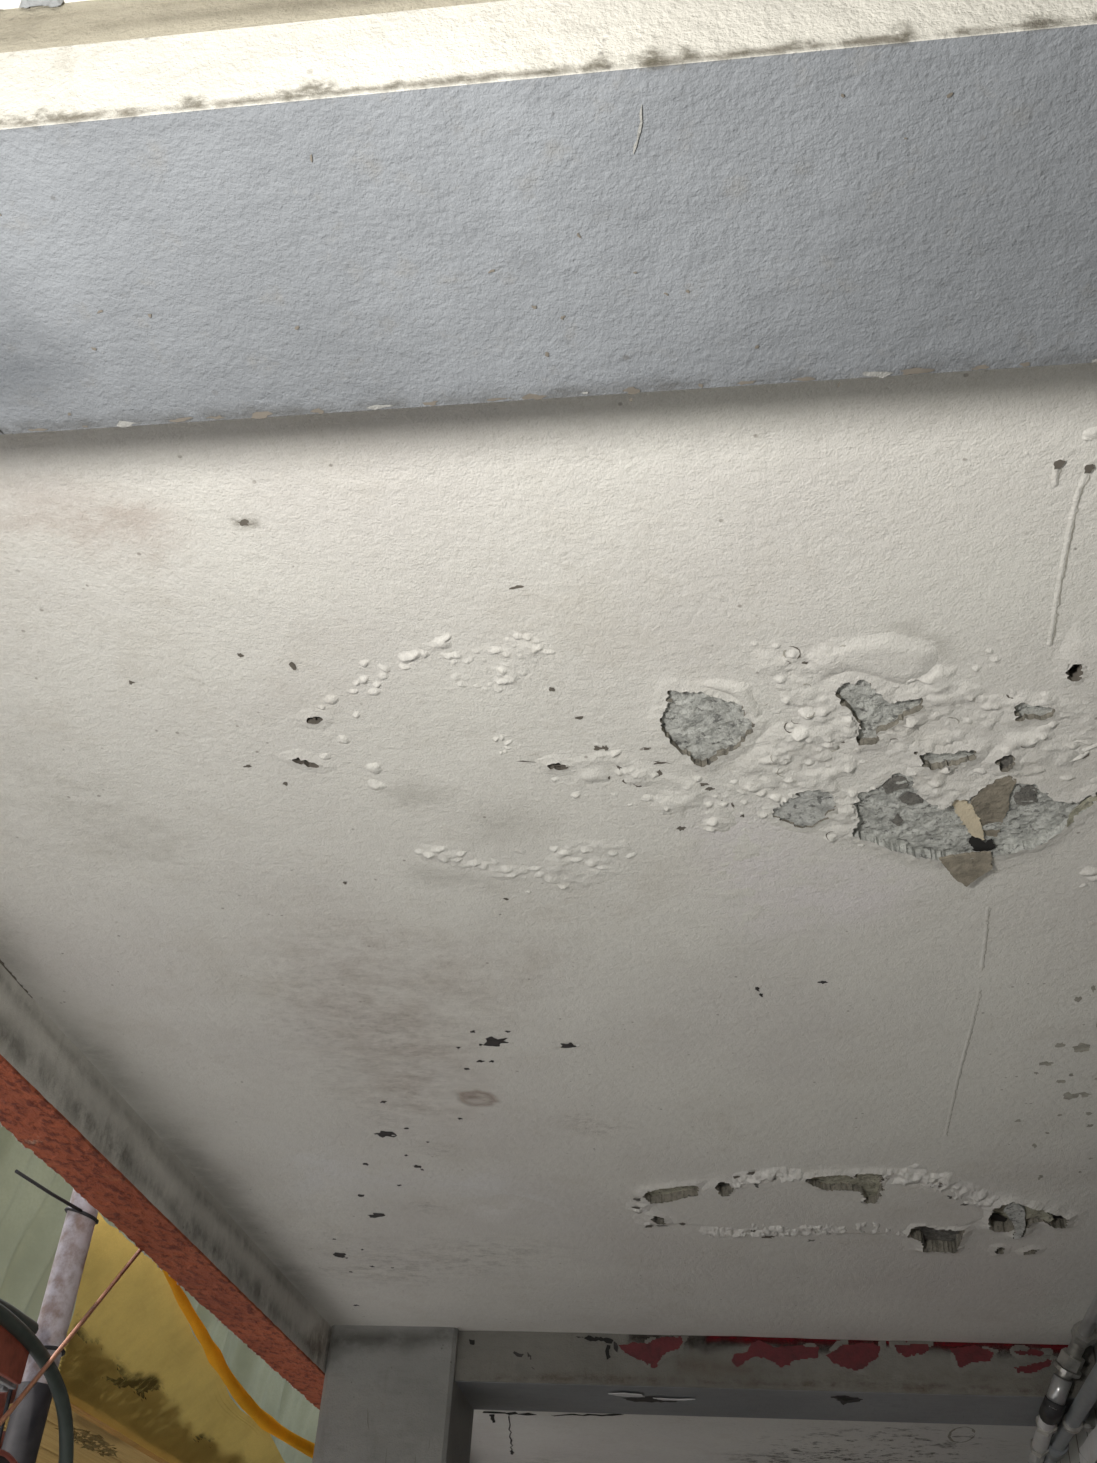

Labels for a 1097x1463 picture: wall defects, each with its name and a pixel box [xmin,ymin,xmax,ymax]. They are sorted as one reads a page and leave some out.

crack [1046,464,1090,647]
spalling [1065,664,1083,681]
spalling [635,669,780,817]
spalling [762,671,1097,887]
spalling [625,1172,738,1228]
spalling [800,1163,900,1205]
spalling [892,1175,1090,1256]
peeling [619,1335,689,1368]
peeling [732,1339,1057,1378]
spalling [831,1395,863,1405]